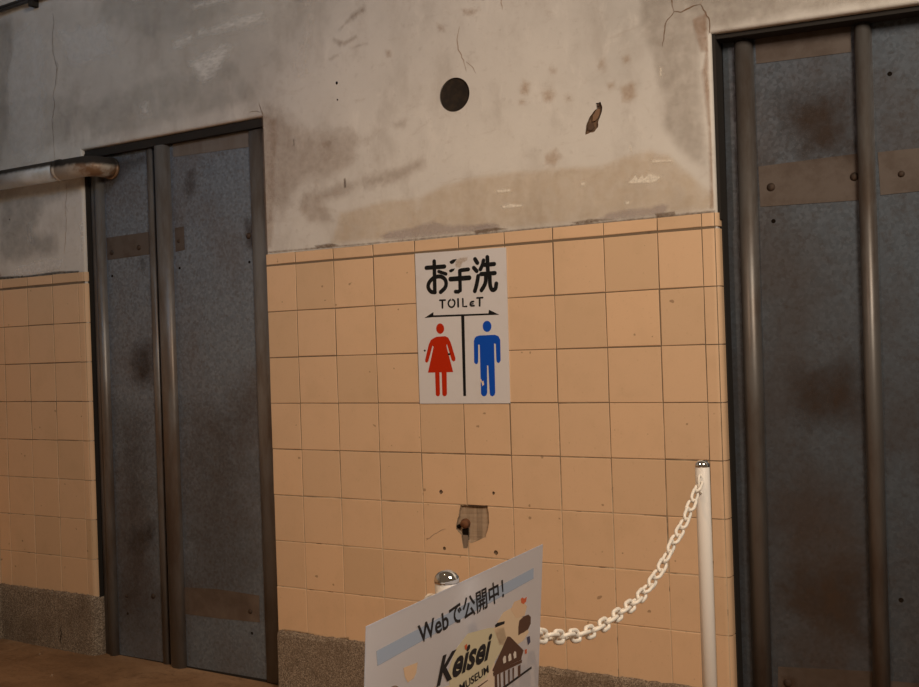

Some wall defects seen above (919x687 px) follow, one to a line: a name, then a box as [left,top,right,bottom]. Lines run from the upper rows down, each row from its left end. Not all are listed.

crack [662,0,710,45]
flaking render [585,102,602,135]
spalling [456,505,489,548]